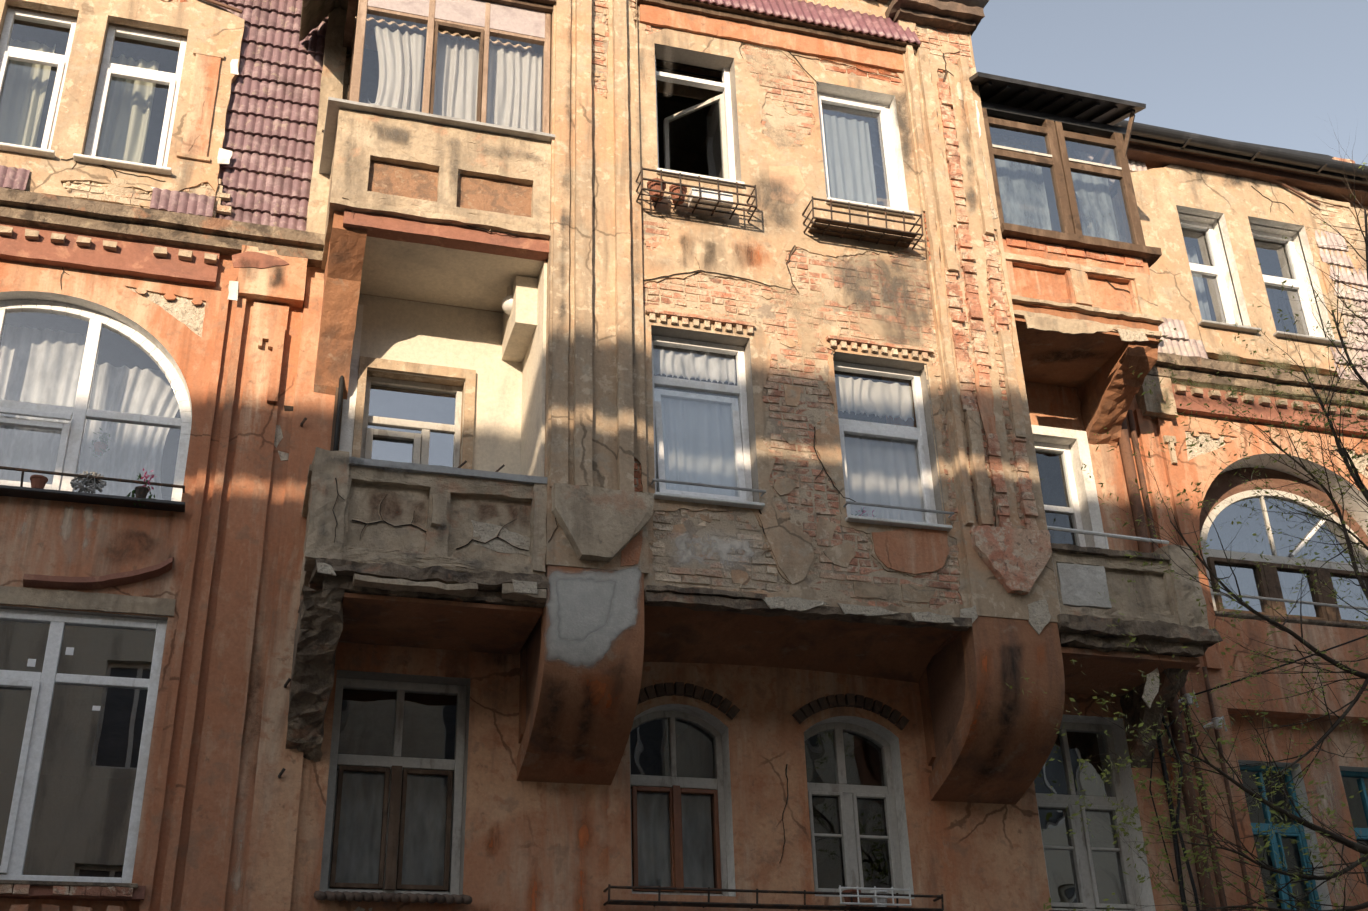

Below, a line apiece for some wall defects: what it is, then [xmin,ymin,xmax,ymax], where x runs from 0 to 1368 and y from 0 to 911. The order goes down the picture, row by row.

peeling [230,59,239,75]
flaking render [591,0,609,99]
flaking render [741,43,903,148]
flaking render [915,25,981,173]
flaking render [61,178,164,211]
flaking render [180,148,232,218]
flaking render [127,287,206,338]
flaking render [620,156,1149,628]
crack [813,427,856,502]
crack [332,477,427,543]
crack [456,518,558,551]
peeling [1028,599,1051,635]